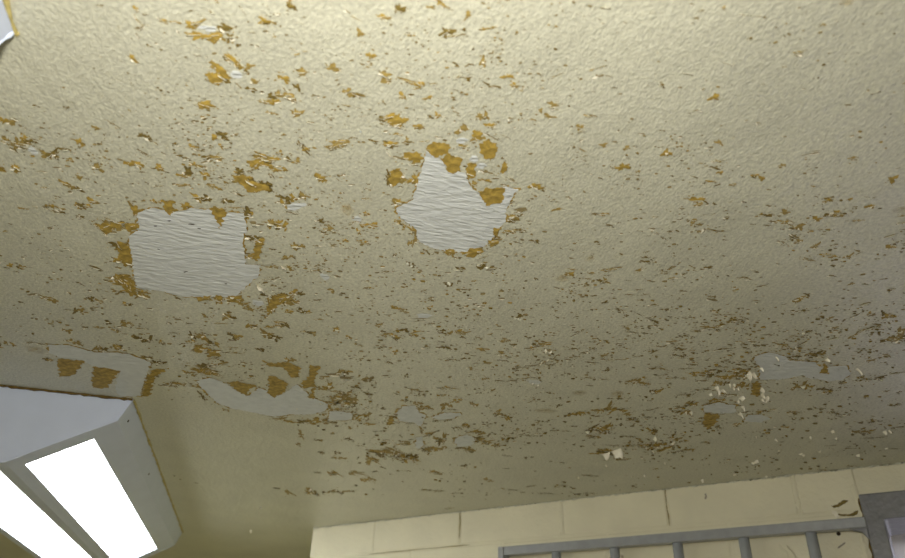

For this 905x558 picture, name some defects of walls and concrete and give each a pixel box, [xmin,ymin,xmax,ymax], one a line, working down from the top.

peeling [378,4,406,22]
peeling [438,10,471,38]
flaking render [324,54,586,288]
peeling [570,114,597,165]
peeling [598,141,641,181]
peeling [683,139,771,190]
flaking render [0,0,388,459]
peeling [638,197,747,254]
peeling [750,192,876,277]
peeling [560,248,688,334]
flaking render [314,289,905,483]
peeling [273,487,355,496]